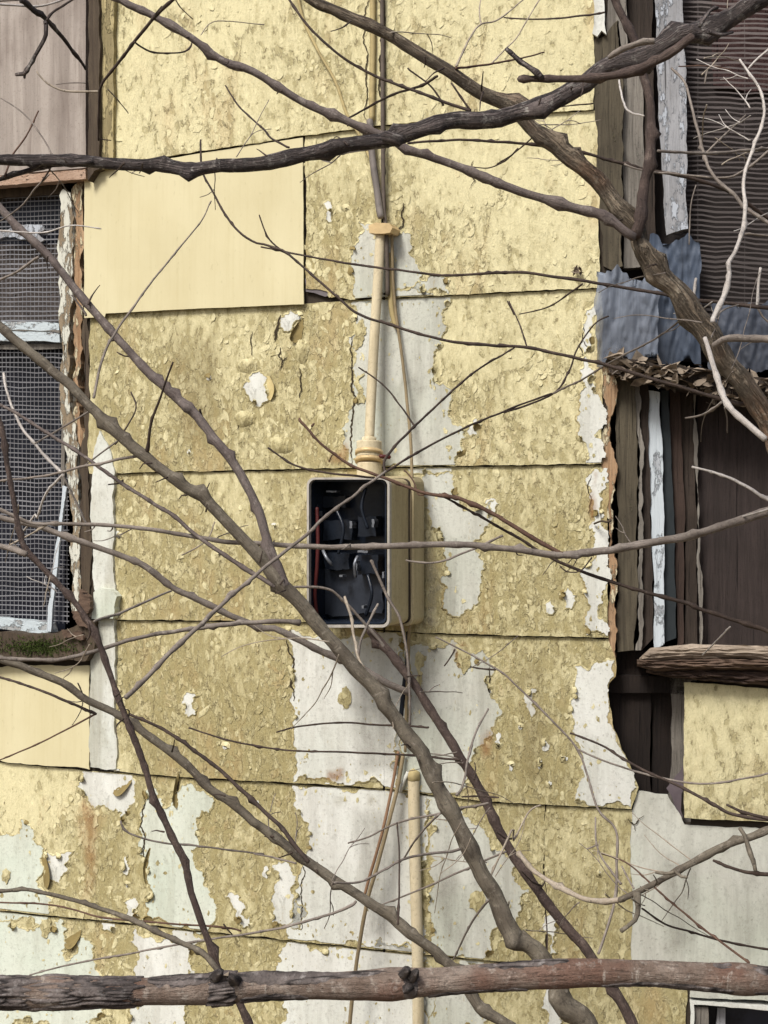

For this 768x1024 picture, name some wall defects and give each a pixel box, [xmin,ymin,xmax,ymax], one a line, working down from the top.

peeling [153,29,171,81]
peeling [158,60,224,148]
peeling [243,98,343,145]
peeling [265,0,357,112]
peeling [347,0,492,119]
peeling [0,144,636,978]